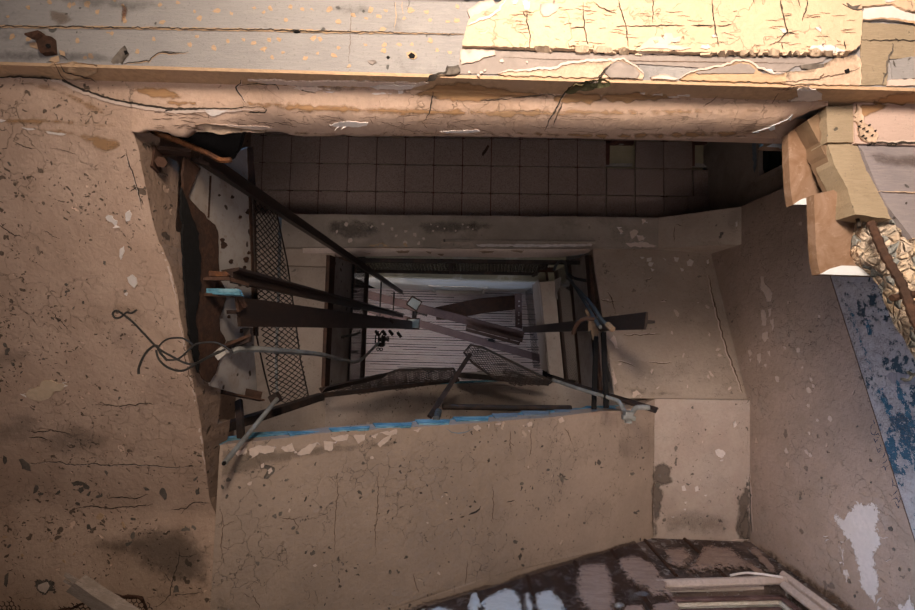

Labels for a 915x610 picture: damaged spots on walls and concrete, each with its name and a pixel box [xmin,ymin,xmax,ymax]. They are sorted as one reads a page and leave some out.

peeling [329,121,368,130]
crack [0,0,857,137]
leakage [248,82,670,118]
spalling [427,0,915,102]
crack [844,38,915,84]
crack [121,151,143,208]
spalling [850,217,915,359]
peeling [874,380,915,430]
peeling [221,429,397,499]
leakage [652,463,672,535]
leakage [736,488,750,540]
peeling [824,501,895,610]